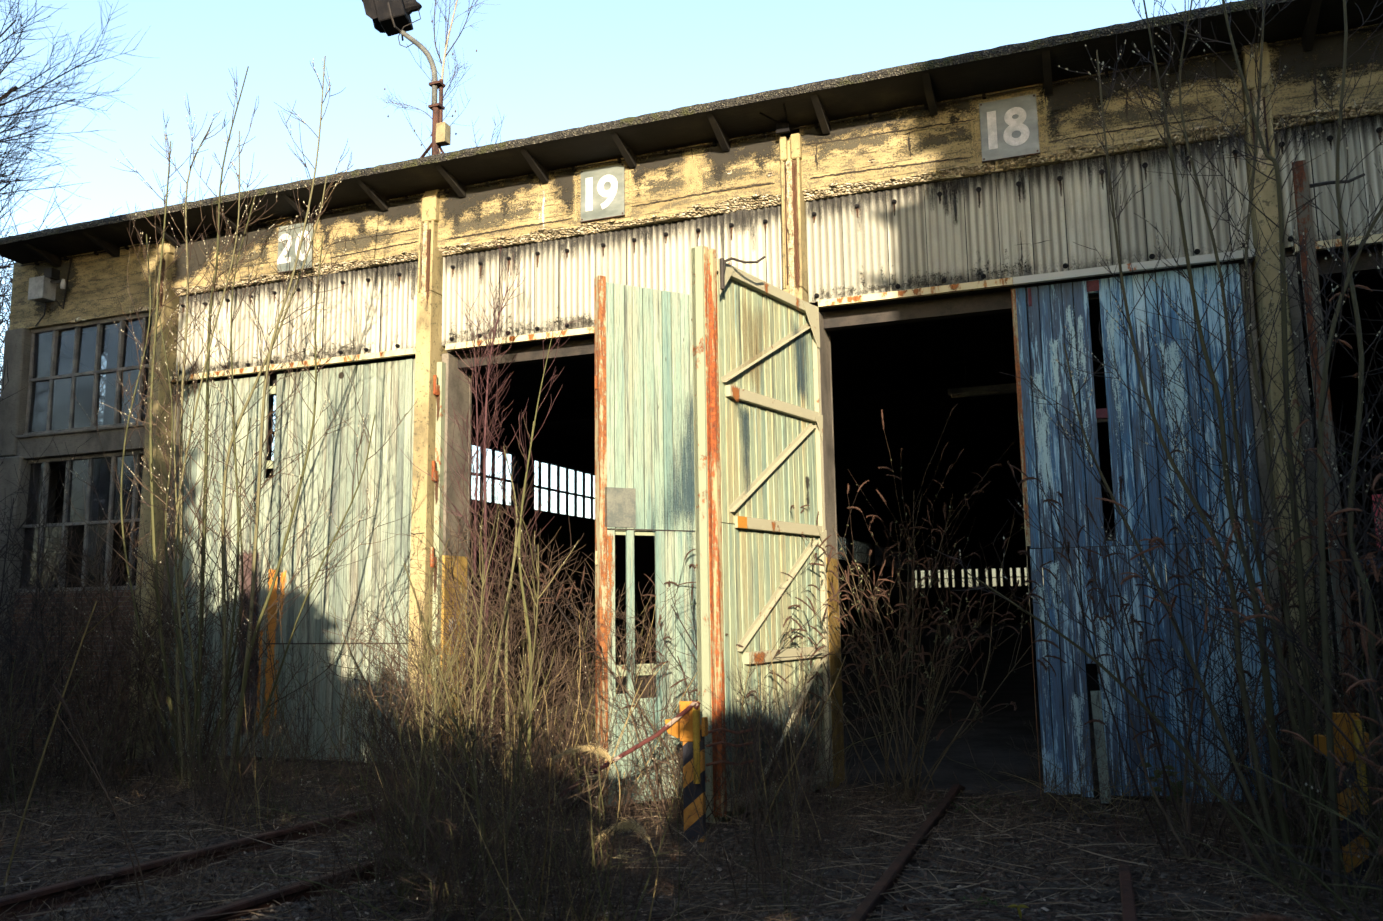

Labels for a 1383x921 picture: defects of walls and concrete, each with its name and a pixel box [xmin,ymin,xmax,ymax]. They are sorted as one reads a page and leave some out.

water stain [171,219,418,306]
water stain [320,194,422,255]
water stain [441,131,782,281]
water stain [812,247,1033,301]
water stain [801,49,1245,223]
peeling [1033,305,1092,501]
peeling [1106,312,1124,454]
peeling [1156,340,1189,527]